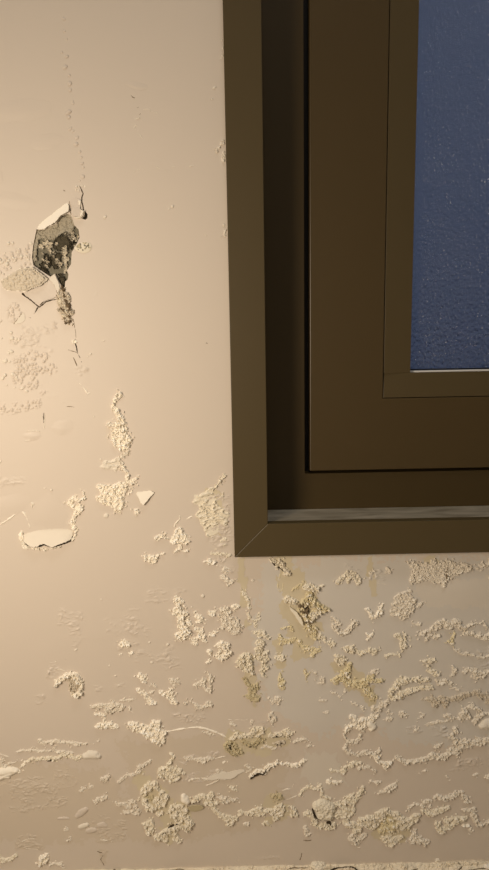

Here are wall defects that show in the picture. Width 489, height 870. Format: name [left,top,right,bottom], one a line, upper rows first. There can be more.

flaking render [1,185,92,326]
crack [14,293,57,324]
flaking render [131,490,154,516]
peeling [0,504,79,551]
leakage [0,473,489,863]